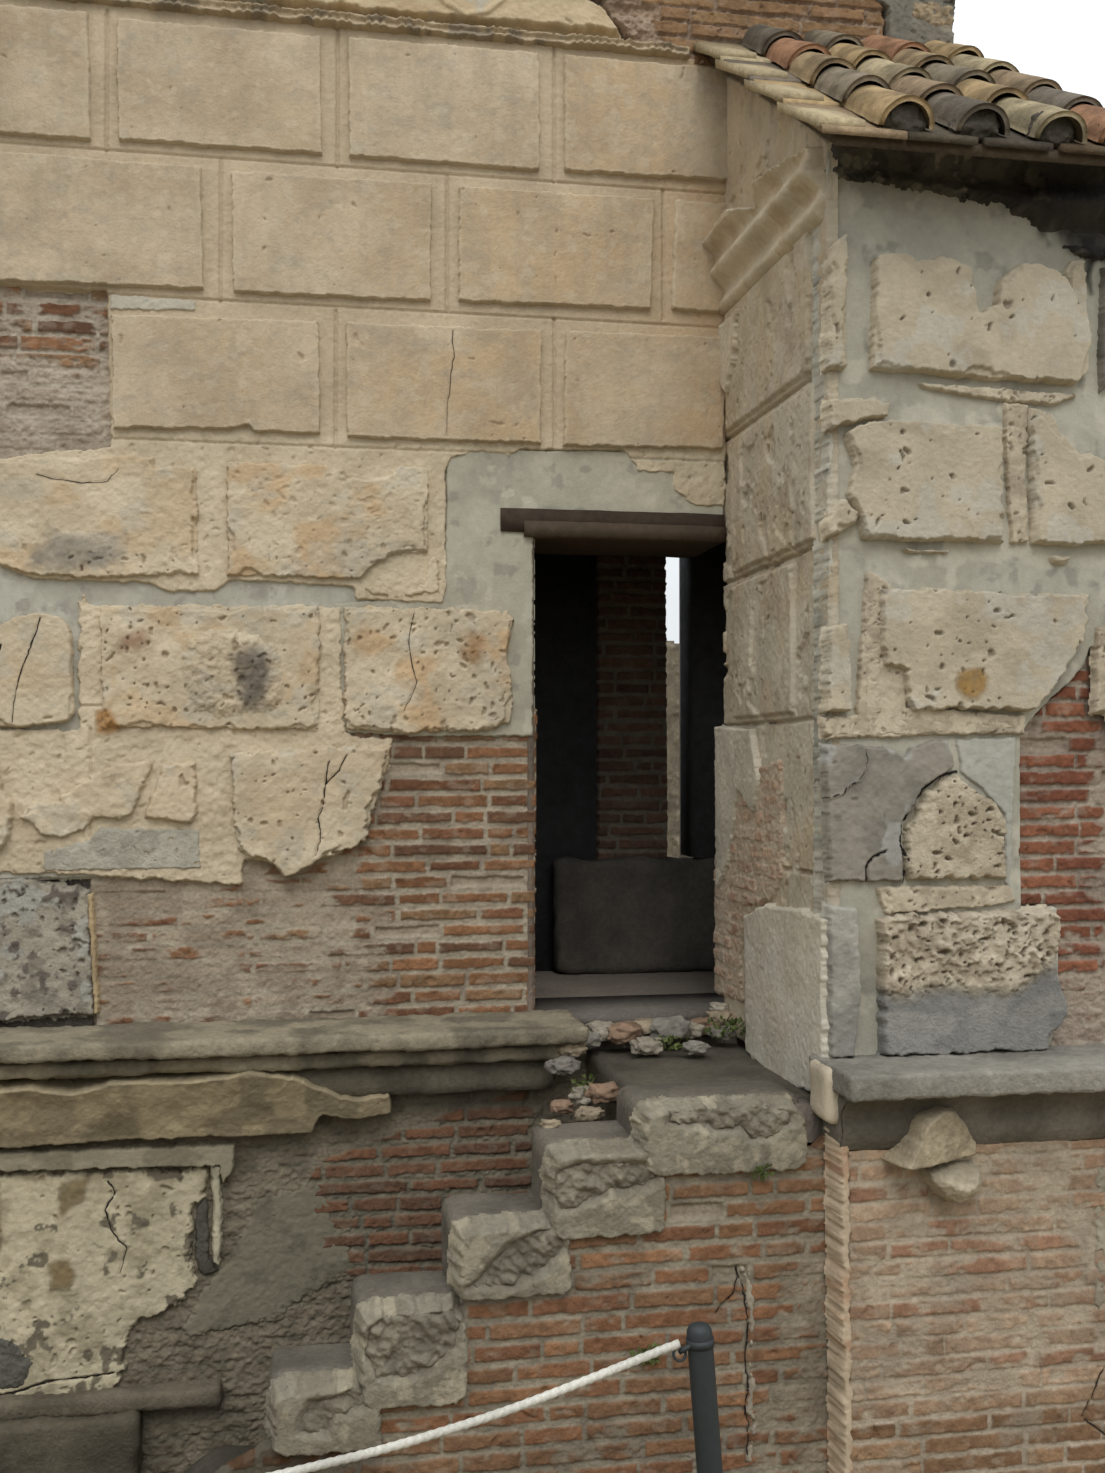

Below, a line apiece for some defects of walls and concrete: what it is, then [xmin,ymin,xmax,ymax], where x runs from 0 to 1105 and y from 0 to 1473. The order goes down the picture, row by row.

flaking render [591,0,885,66]
crack [105,1181,127,1272]
flaking render [0,1166,210,1395]
crack [1081,1368,1105,1435]